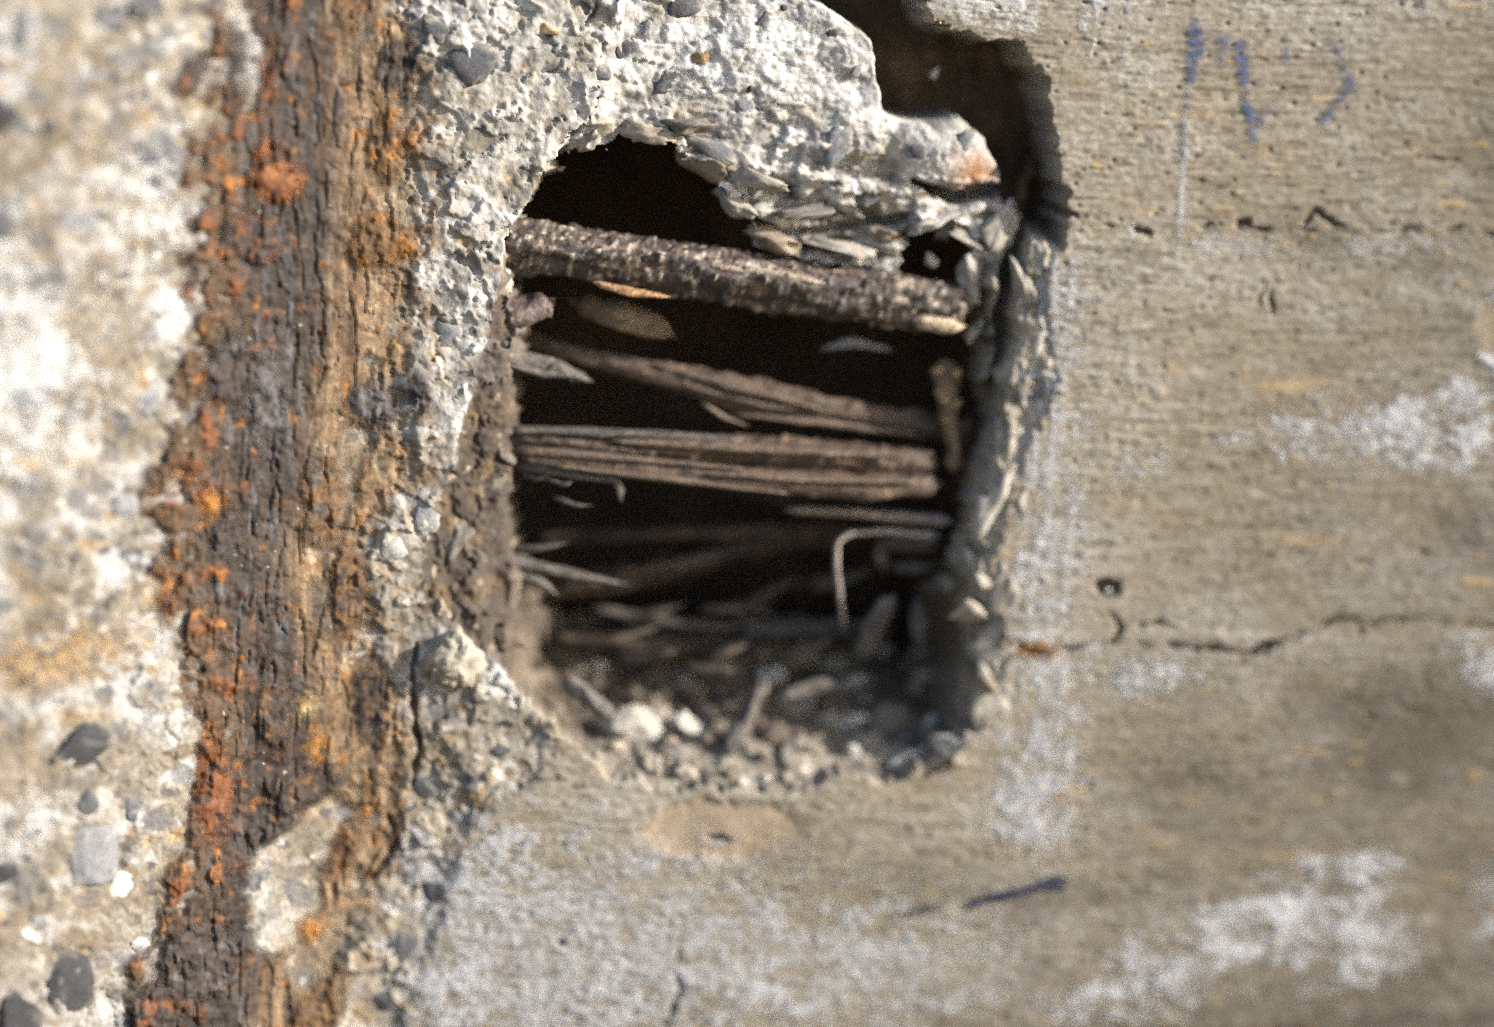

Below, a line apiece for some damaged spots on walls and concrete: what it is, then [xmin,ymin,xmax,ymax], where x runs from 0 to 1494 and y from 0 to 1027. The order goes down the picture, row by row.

rust [504,217,974,335]
spalling [0,0,272,1027]
rust [116,0,433,1027]
spalling [242,0,1069,1027]
rust [528,521,960,602]
crack [1010,610,1494,659]
efflorescence [1051,849,1425,1023]